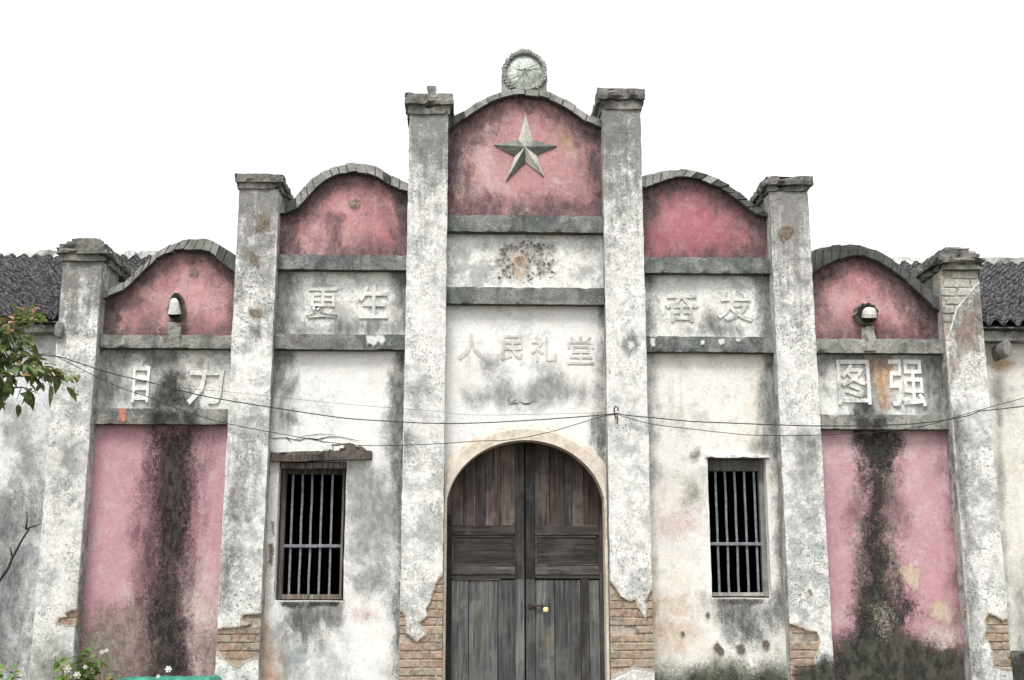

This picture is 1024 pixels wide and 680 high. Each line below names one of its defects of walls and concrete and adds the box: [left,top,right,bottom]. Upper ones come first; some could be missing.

spalling [497,241,556,280]
rust [871,355,894,408]
spalling [56,608,79,627]
leakage [79,350,204,680]
spalling [183,463,279,676]
spalling [398,569,444,680]
spalling [609,575,654,678]
spalling [787,618,820,680]
leakage [832,390,965,680]
spalling [984,612,1012,670]